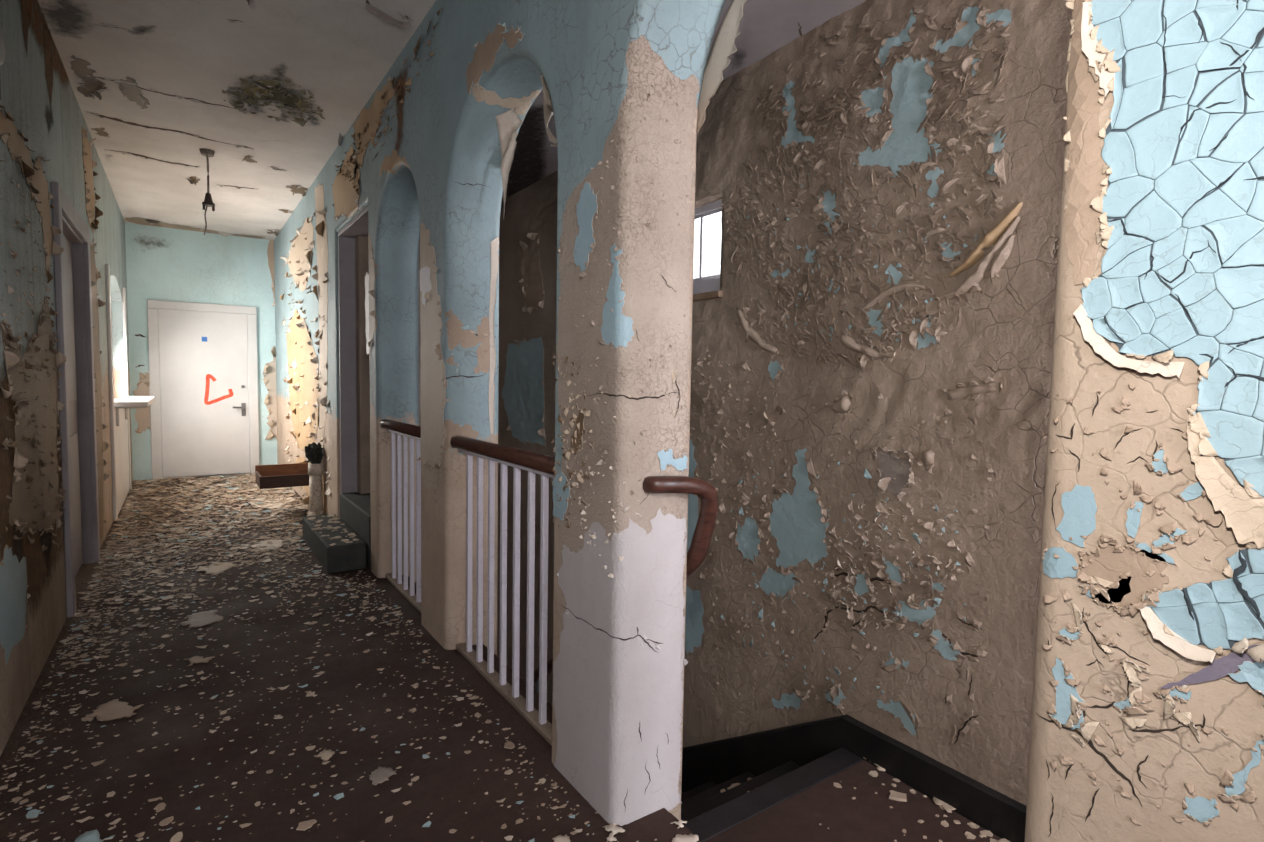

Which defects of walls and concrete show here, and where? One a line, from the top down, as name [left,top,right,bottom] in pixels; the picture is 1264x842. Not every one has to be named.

water stain [237,69,318,124]
crack [1162,4,1264,151]
peeling [0,105,67,665]
peeling [81,126,111,541]
peeling [125,3,442,512]
peeling [417,0,1012,842]
peeling [1041,0,1264,755]
crack [1107,218,1264,332]
crack [1197,337,1264,387]
crack [1036,576,1208,837]
peeling [1172,734,1264,826]
crack [1233,549,1260,619]